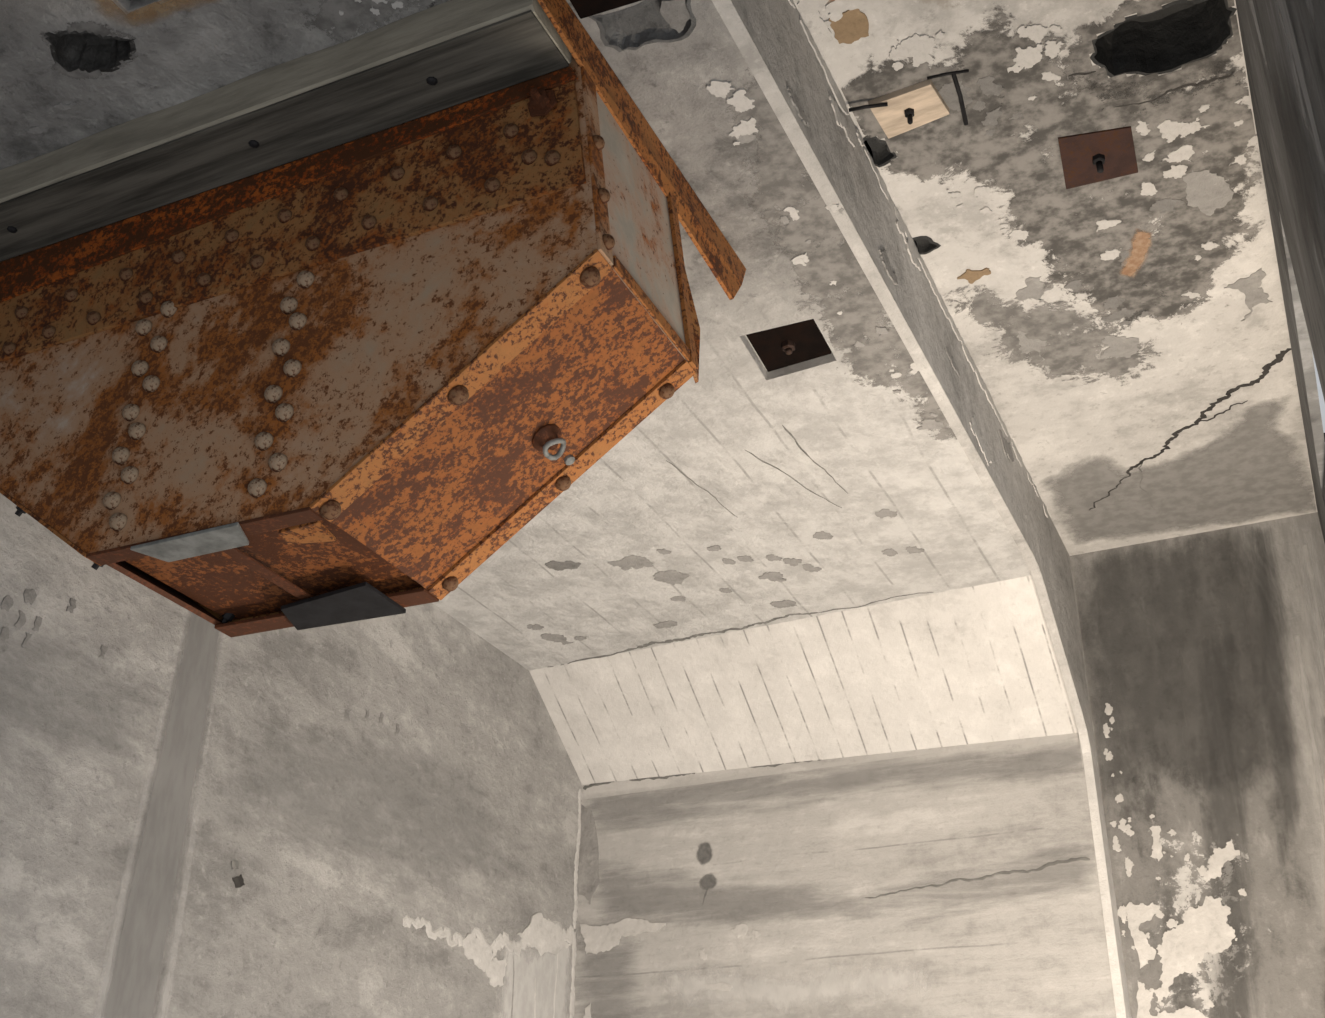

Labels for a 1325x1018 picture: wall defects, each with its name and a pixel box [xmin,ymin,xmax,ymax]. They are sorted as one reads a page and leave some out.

spalling [41,21,138,79]
spalling [589,0,696,52]
peeling [706,67,957,440]
peeling [787,0,1273,519]
crack [1089,348,1291,510]
damp [1047,403,1316,541]
peeling [608,549,690,602]
peeling [707,545,822,582]
peeling [1103,703,1122,777]
damp [697,843,716,903]
crack [865,857,1090,899]
peeling [1110,814,1253,1018]